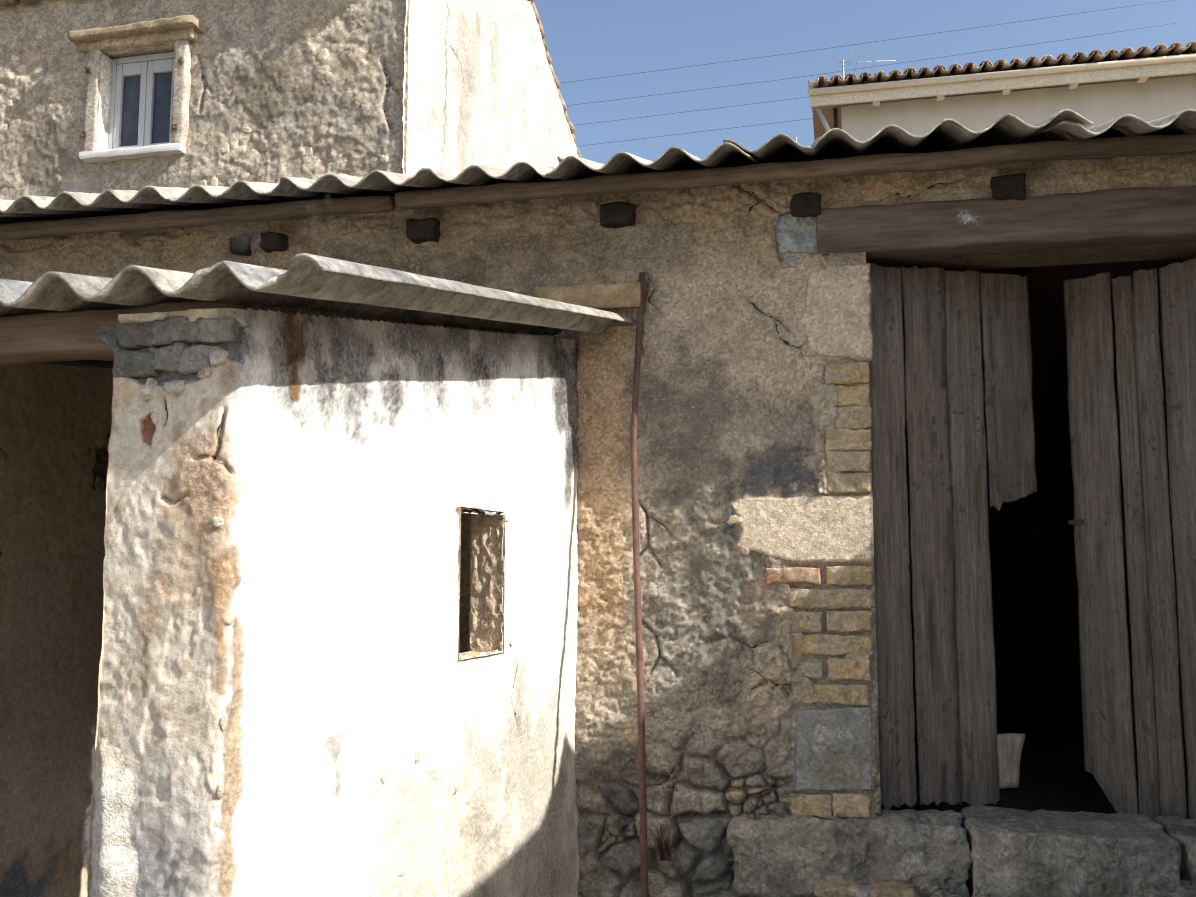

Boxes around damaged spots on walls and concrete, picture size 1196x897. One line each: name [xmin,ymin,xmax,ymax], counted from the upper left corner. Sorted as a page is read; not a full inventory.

flaking render [91,433,110,494]
spalling [117,327,250,445]
leakage [269,298,400,441]
leakage [392,310,512,404]
leakage [536,326,579,504]
crack [737,639,791,691]